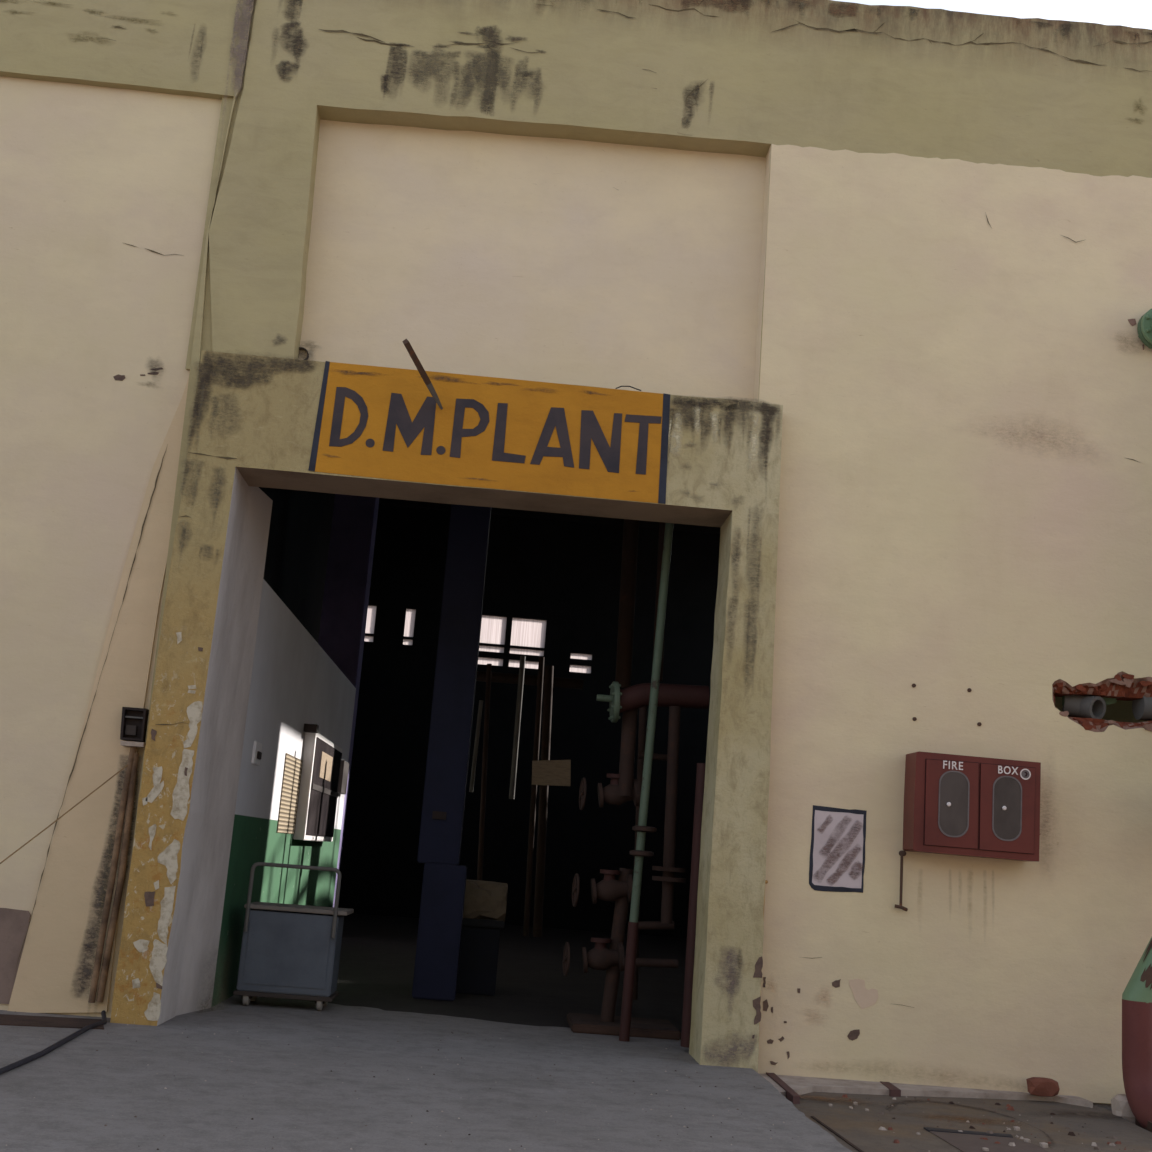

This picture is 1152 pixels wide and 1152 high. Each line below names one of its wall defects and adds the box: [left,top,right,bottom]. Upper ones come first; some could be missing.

damp [275,0,306,79]
damp [381,26,540,112]
crack [584,0,718,18]
crack [772,21,1152,72]
damp [189,354,314,445]
spalling [1052,672,1152,732]
peeling [142,685,203,821]
peeling [132,824,180,1021]
spalling [752,956,790,1065]